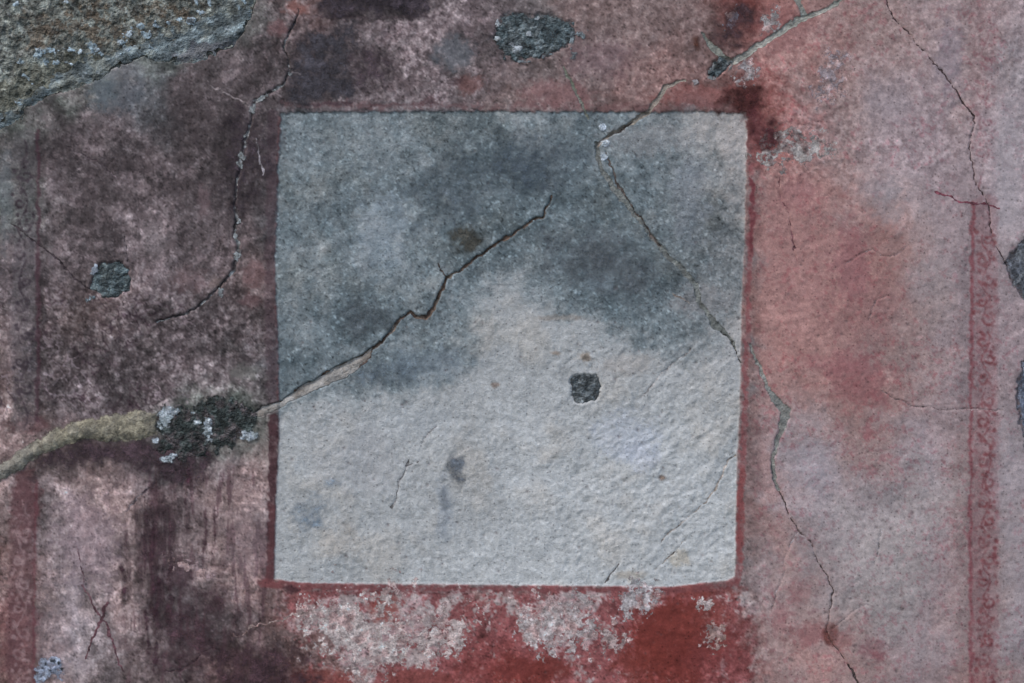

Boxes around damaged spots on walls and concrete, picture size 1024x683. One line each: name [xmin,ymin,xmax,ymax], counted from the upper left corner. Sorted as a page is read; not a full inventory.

spalling [0,0,255,130]
crack [701,0,842,65]
crack [157,9,303,323]
crack [887,1,1007,266]
crack [11,224,90,289]
crack [256,195,553,416]
crack [563,66,859,683]
crack [390,426,437,509]
peeling [232,568,490,683]
peeling [508,576,663,669]
peeling [691,596,727,655]